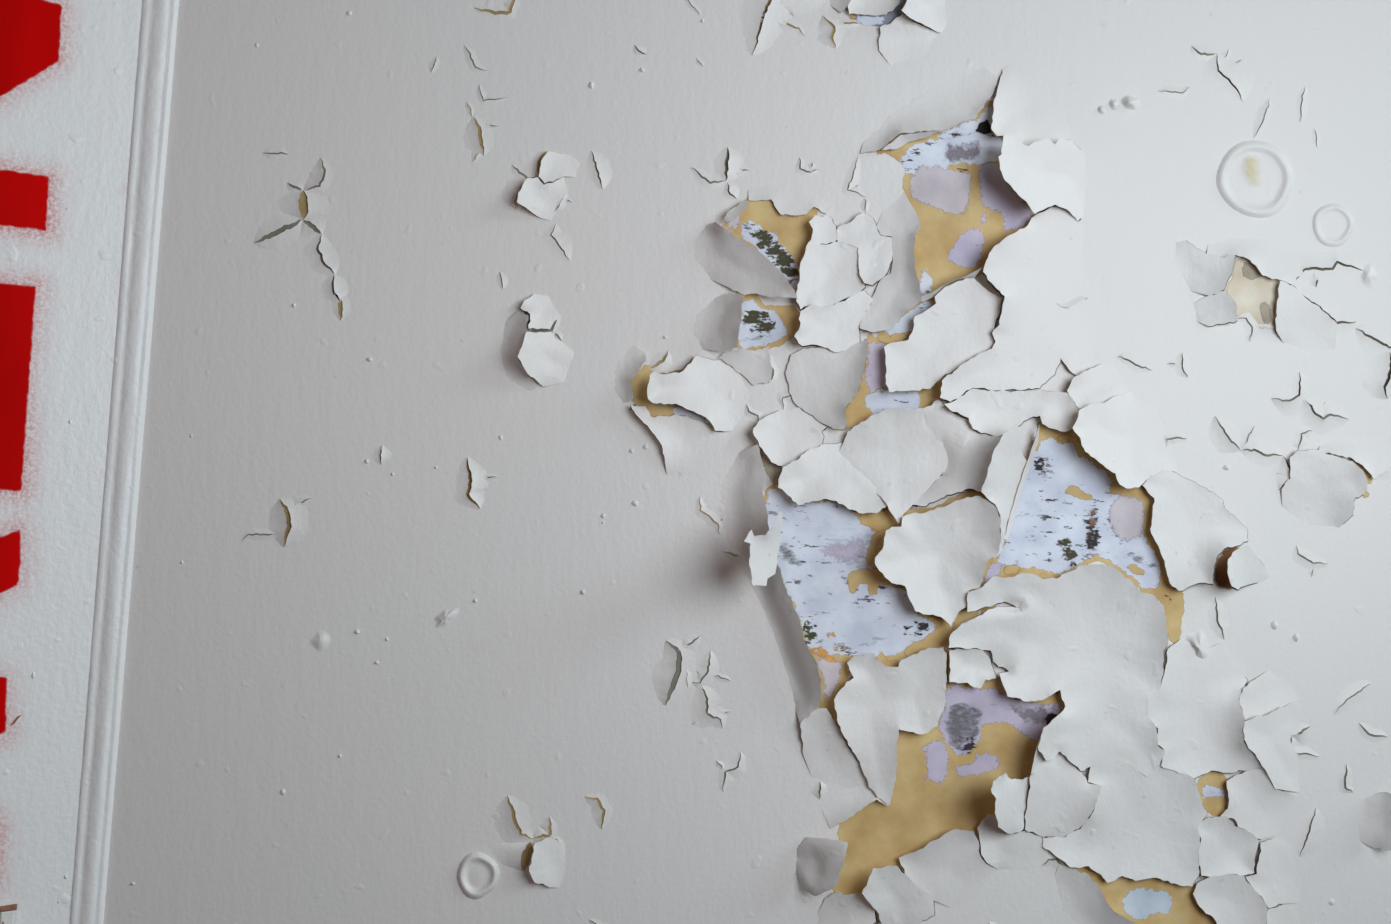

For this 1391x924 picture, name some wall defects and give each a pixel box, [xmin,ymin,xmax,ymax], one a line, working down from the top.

peeling [830,0,947,66]
crack [254,147,351,320]
peeling [1175,238,1337,351]
peeling [614,63,1302,924]